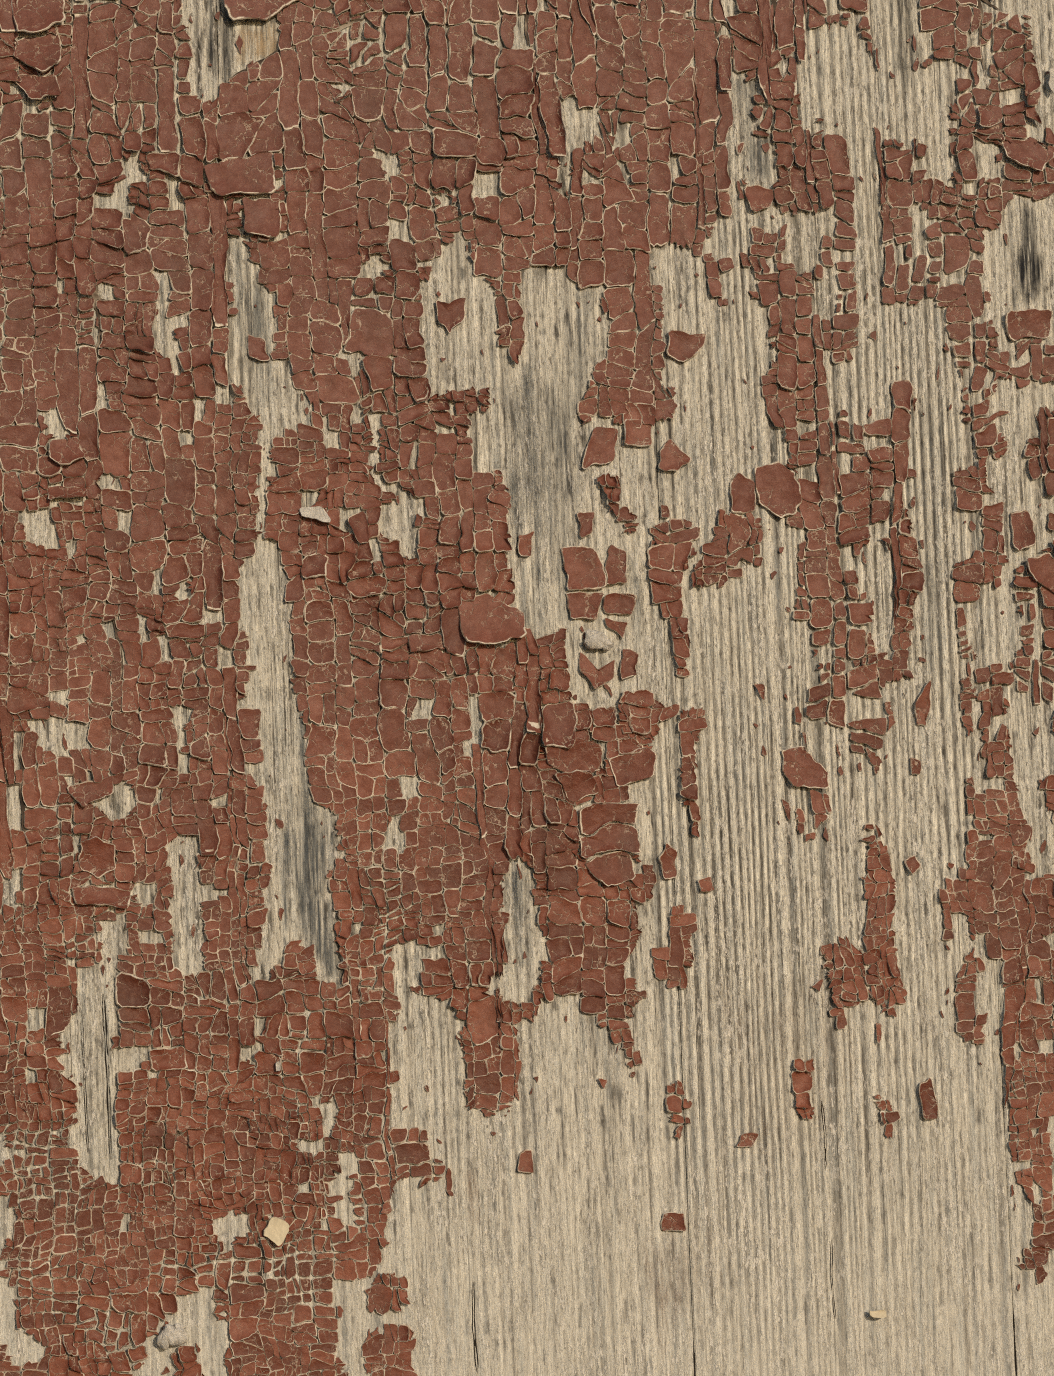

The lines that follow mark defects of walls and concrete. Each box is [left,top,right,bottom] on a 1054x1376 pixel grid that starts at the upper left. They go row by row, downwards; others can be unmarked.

crack [71,1,181,132]
crack [523,0,531,45]
crack [684,14,739,38]
crack [977,0,999,70]
peeling [78,248,195,434]
peeling [2,387,148,567]
peeling [204,152,354,1085]
peeling [279,0,1054,1376]
crack [2,714,63,933]
crack [213,716,248,984]
peeling [17,686,221,1247]
peeling [0,1193,69,1376]